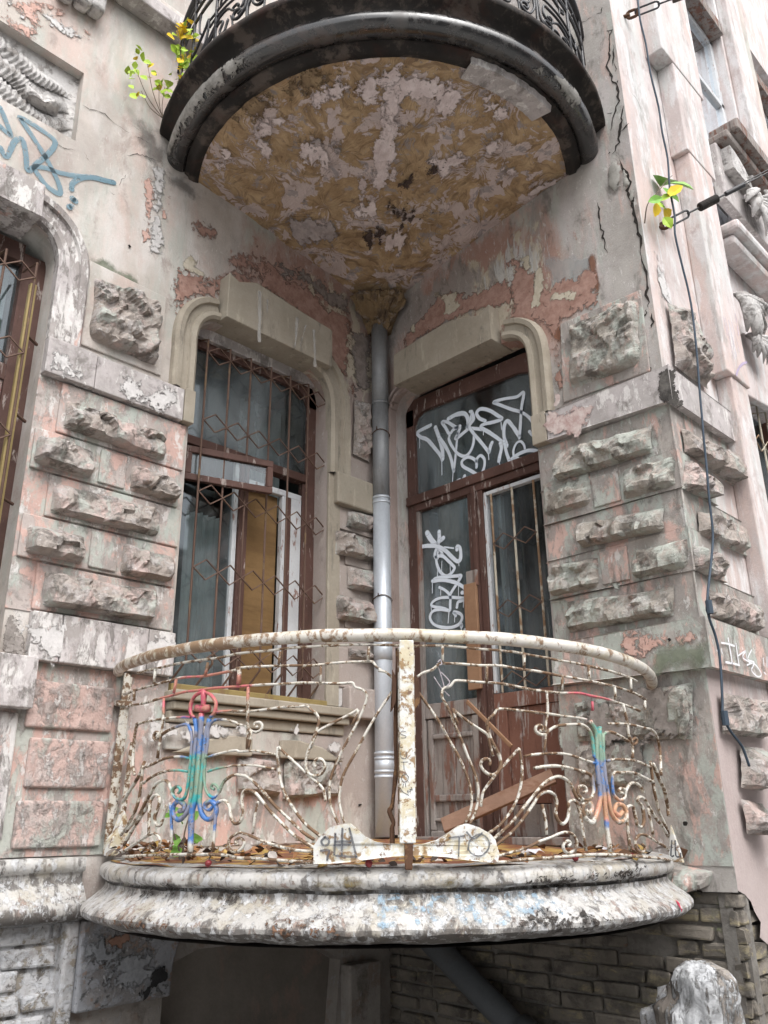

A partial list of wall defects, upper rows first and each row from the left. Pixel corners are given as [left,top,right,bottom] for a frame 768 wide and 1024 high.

peeling [2,0,91,41]
peeling [167,57,247,155]
peeling [142,166,167,254]
peeling [230,58,472,262]
crack [578,8,655,328]
peeling [403,255,599,439]
peeling [618,629,697,659]
peeling [80,913,177,1001]
spalling [264,916,340,941]
peeling [517,906,615,934]
peeling [526,863,646,894]
flaking render [667,862,713,893]